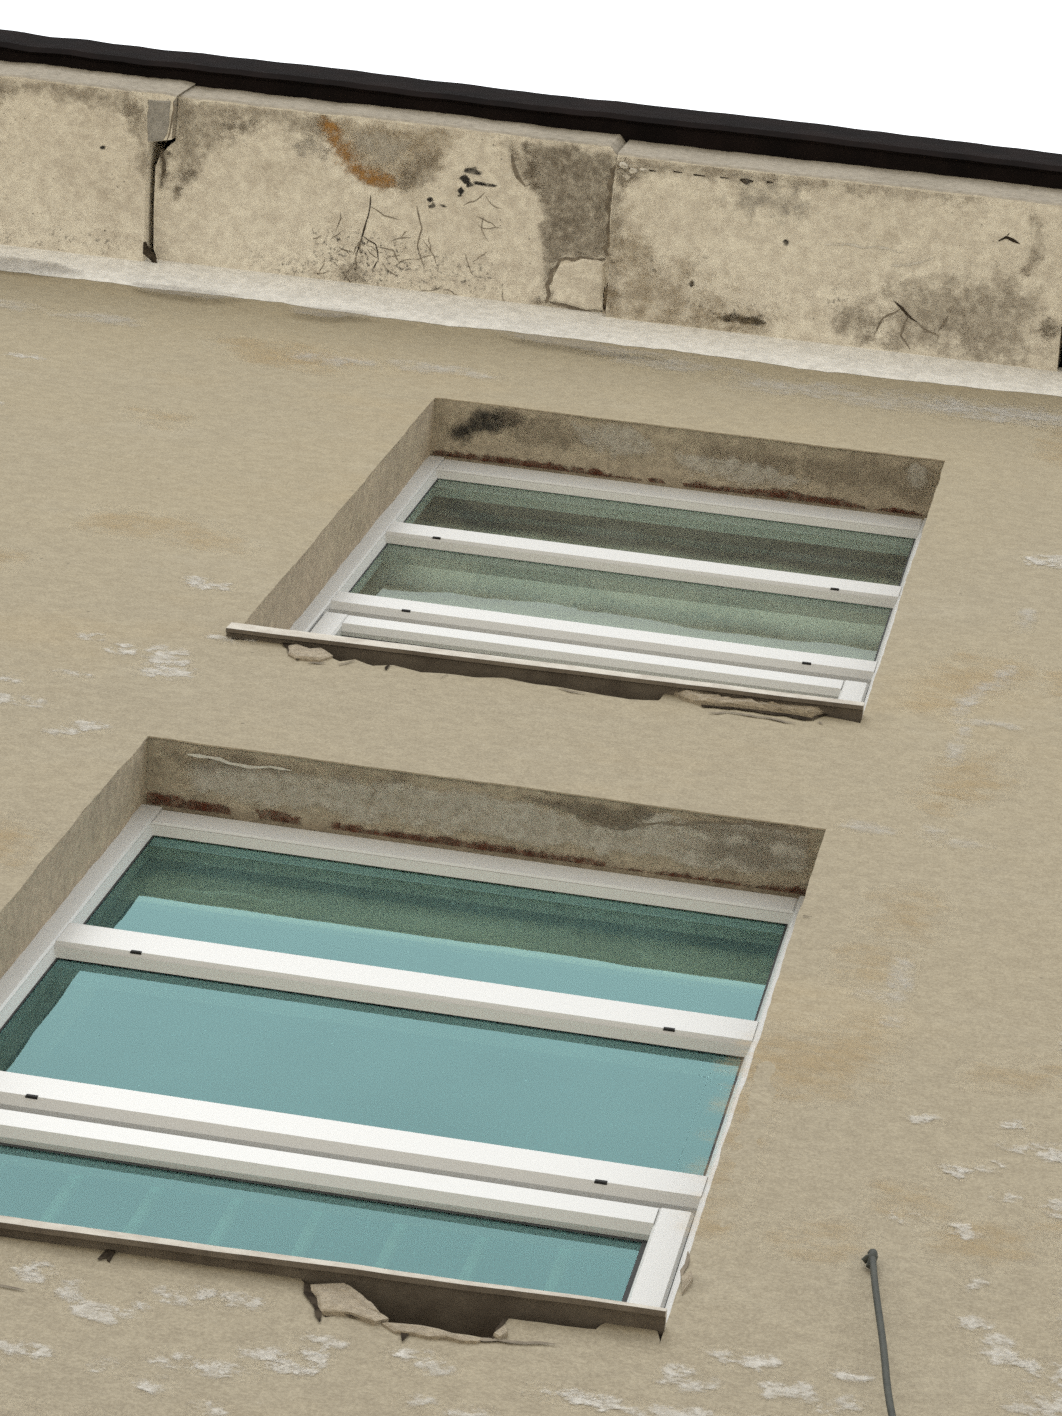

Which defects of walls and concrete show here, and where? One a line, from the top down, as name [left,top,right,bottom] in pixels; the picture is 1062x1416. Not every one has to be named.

crack [160,101,175,180]
corrosion [324,121,438,186]
crack [143,242,157,263]
crack [314,154,566,301]
leakage [524,143,611,275]
flaking render [545,256,605,312]
flaking render [674,690,827,723]
corrosion [146,793,231,815]
corrosion [256,809,300,824]
corrosion [332,823,807,895]
peeling [0,1341,50,1358]
flaking render [153,1282,555,1377]